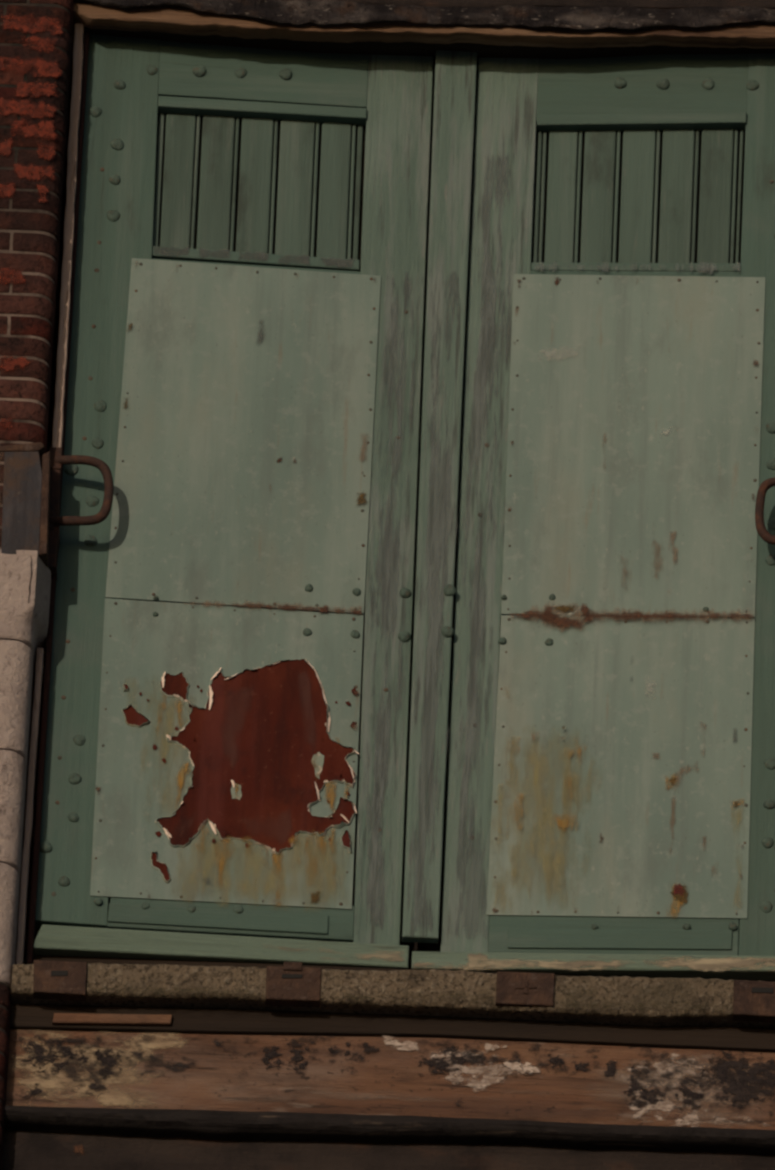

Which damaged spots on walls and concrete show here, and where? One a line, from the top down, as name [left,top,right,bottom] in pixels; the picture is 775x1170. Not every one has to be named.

rust [512,604,754,630]
peeling [122,684,151,728]
peeling [153,658,359,854]
peeling [150,851,171,883]
leakage [19,1035,194,1098]
leakage [245,1035,379,1078]
leakage [418,1040,775,1114]